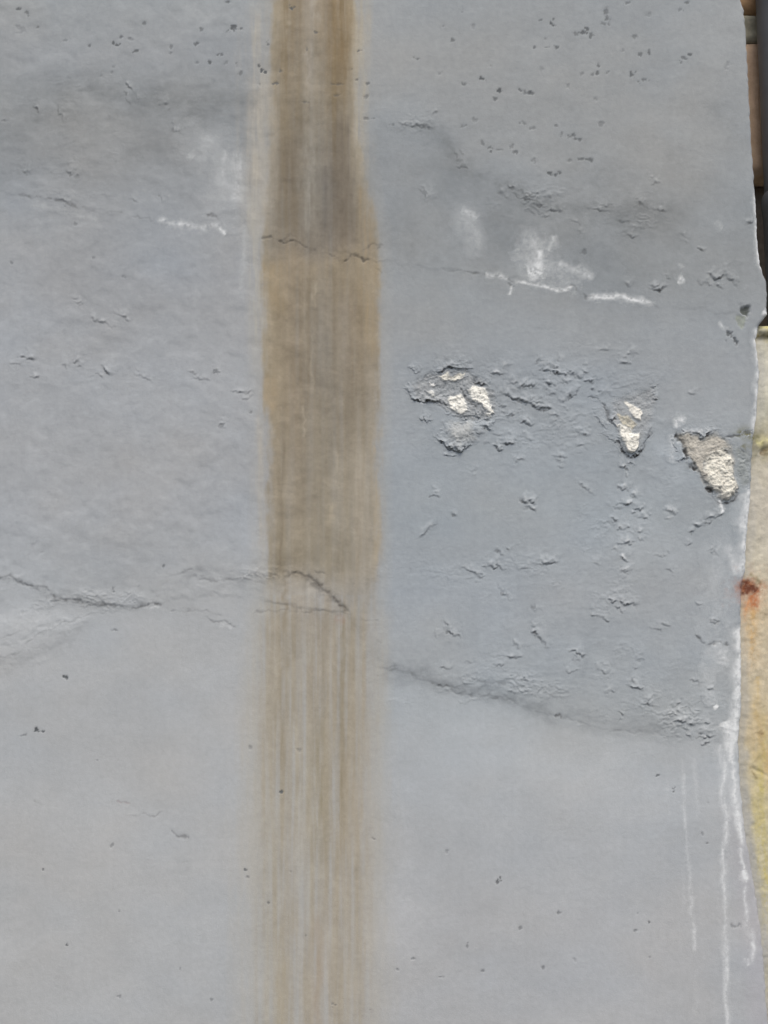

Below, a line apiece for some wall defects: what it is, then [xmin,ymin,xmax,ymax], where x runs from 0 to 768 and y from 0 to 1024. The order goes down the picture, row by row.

efflorescence [448,201,490,260]
water stain [507,179,665,299]
peeling [695,259,745,291]
water stain [749,185,766,282]
water stain [747,306,767,424]
flaking render [401,338,753,578]
crack [0,536,667,738]
peeling [450,537,565,605]
corrosion [718,560,768,682]
water stain [664,483,768,1024]